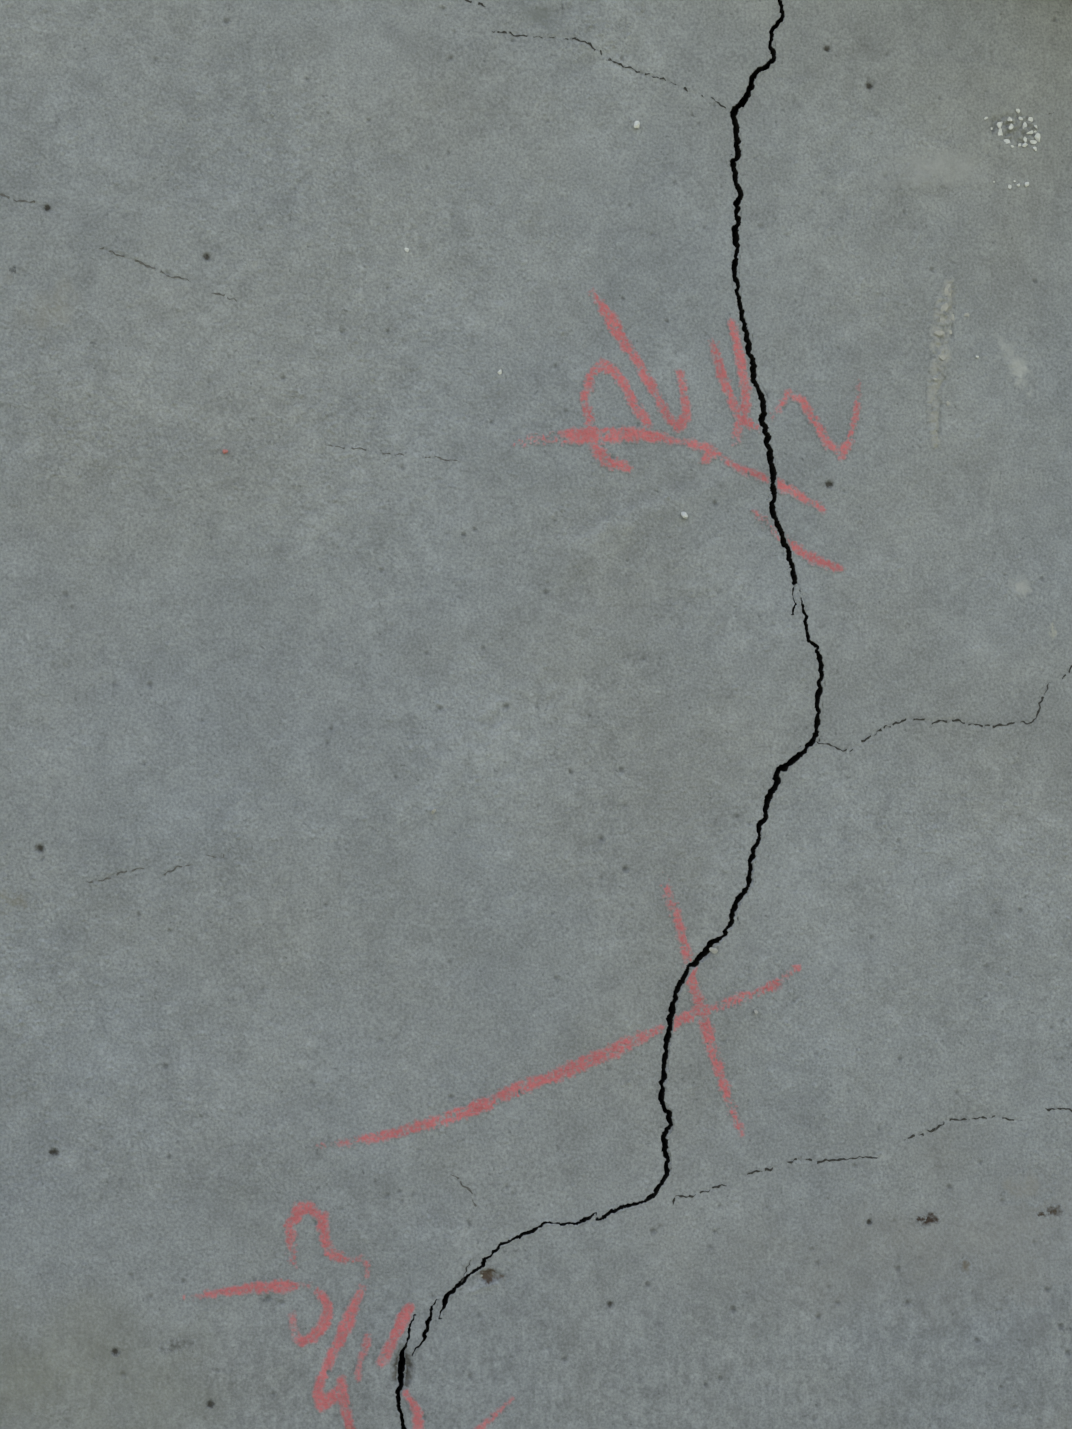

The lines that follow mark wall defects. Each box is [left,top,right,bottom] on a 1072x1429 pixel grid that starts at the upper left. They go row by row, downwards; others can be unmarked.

crack [329,445,457,461]
crack [392,0,1072,1429]